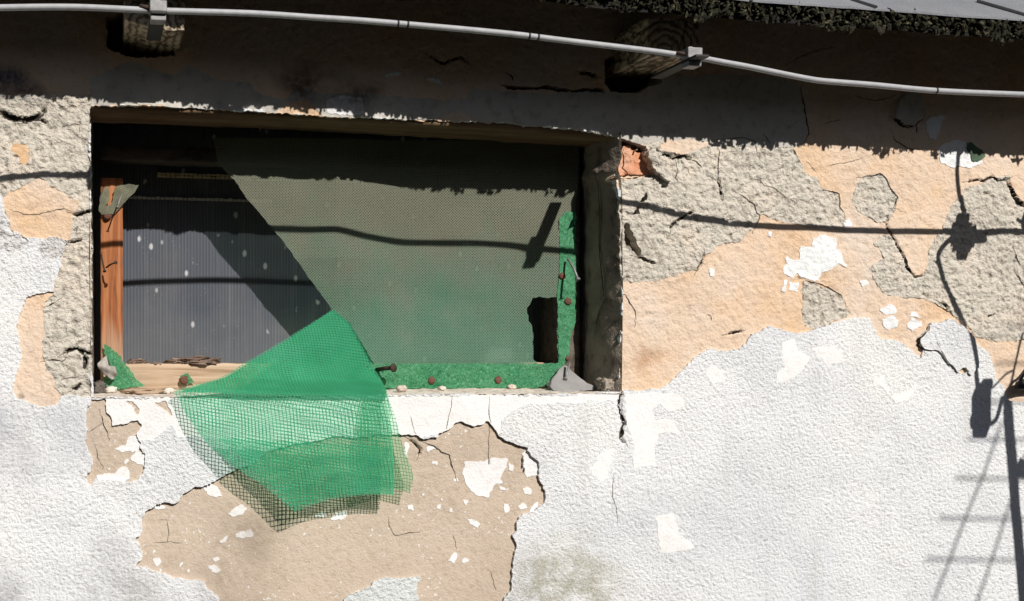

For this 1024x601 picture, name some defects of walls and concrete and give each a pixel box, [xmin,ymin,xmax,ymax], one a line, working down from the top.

peeling [185,0,694,43]
peeling [0,10,1024,485]
crack [594,134,795,331]
flaking render [136,421,545,601]
crack [617,395,628,447]